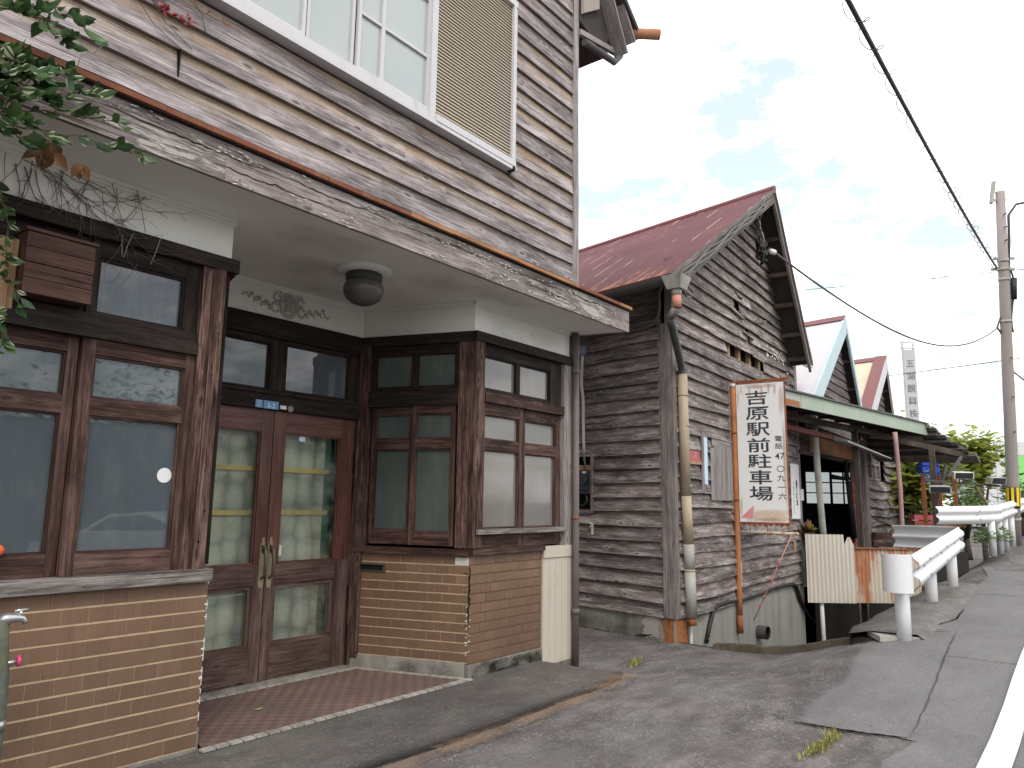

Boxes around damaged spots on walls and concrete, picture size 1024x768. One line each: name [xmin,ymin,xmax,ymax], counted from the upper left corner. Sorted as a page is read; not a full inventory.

peeling [424,241,535,294]
crack [463,566,471,627]